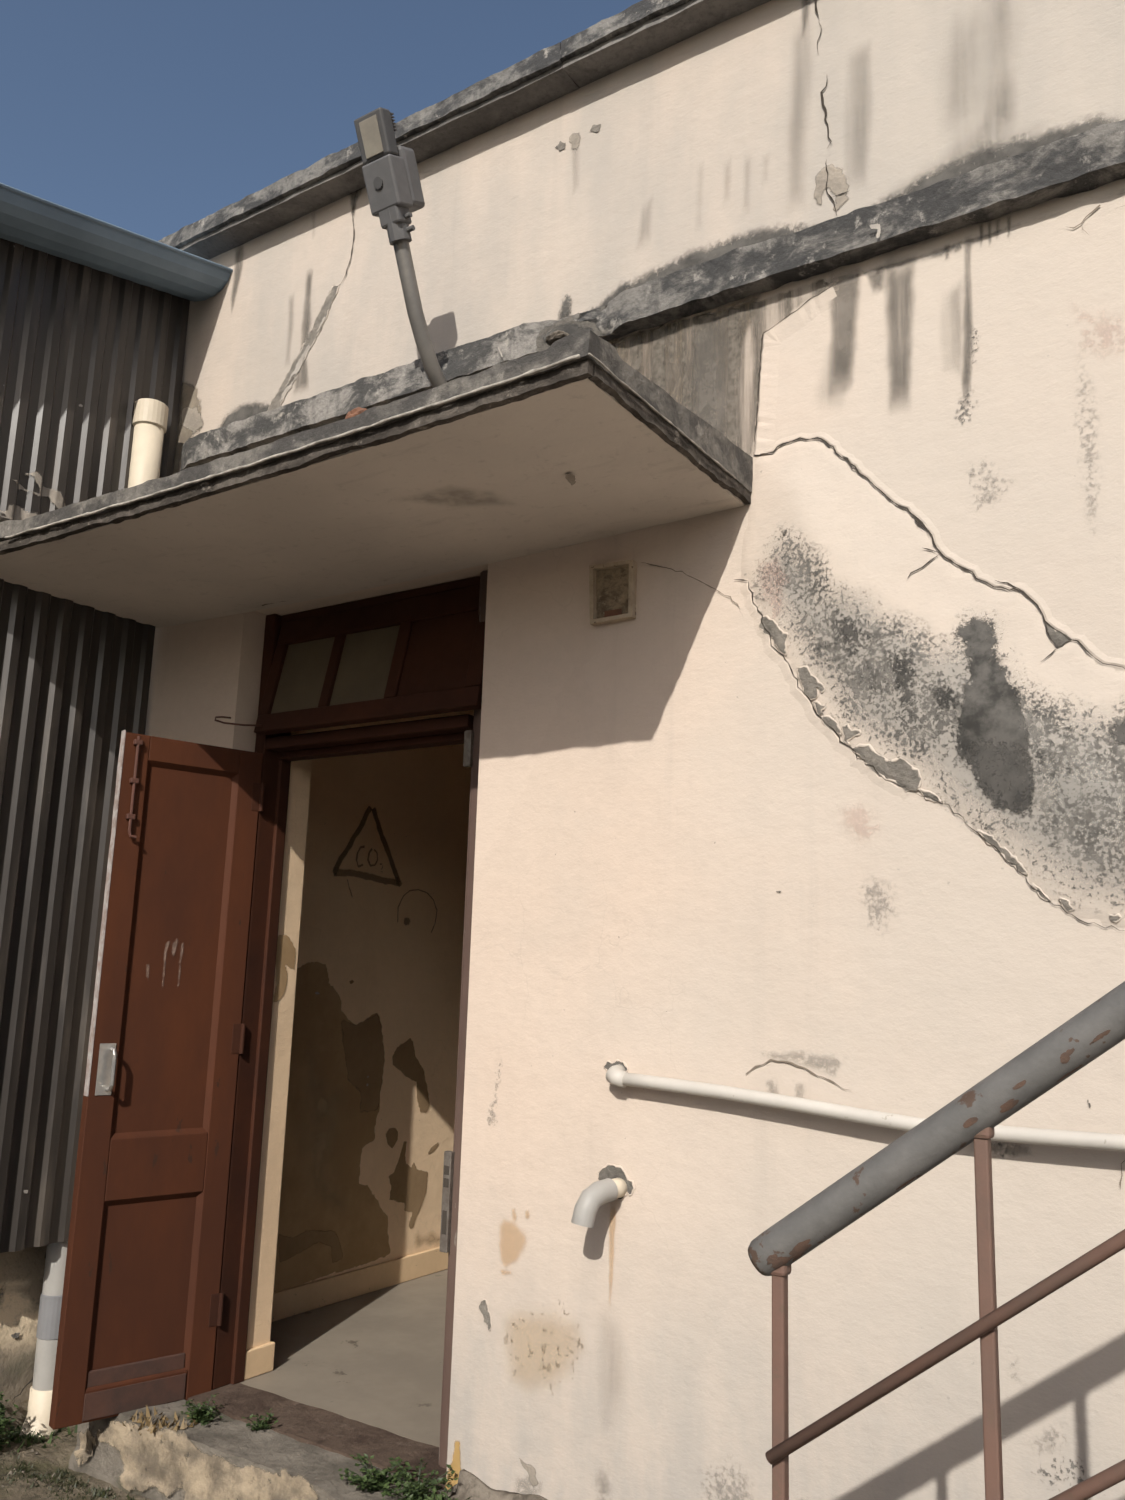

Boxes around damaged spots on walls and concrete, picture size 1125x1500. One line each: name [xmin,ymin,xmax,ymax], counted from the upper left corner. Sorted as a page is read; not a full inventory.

crack [341,190,357,283]
peeling [814,164,868,211]
crack [1069,204,1125,234]
damp [607,291,792,453]
damp [814,264,910,394]
damp [958,281,977,423]
spalling [0,358,751,555]
crack [754,432,1125,669]
damp [755,533,1125,906]
corrosion [1057,1030,1111,1082]
corrosion [766,1239,812,1269]
damp [1042,1459,1084,1485]